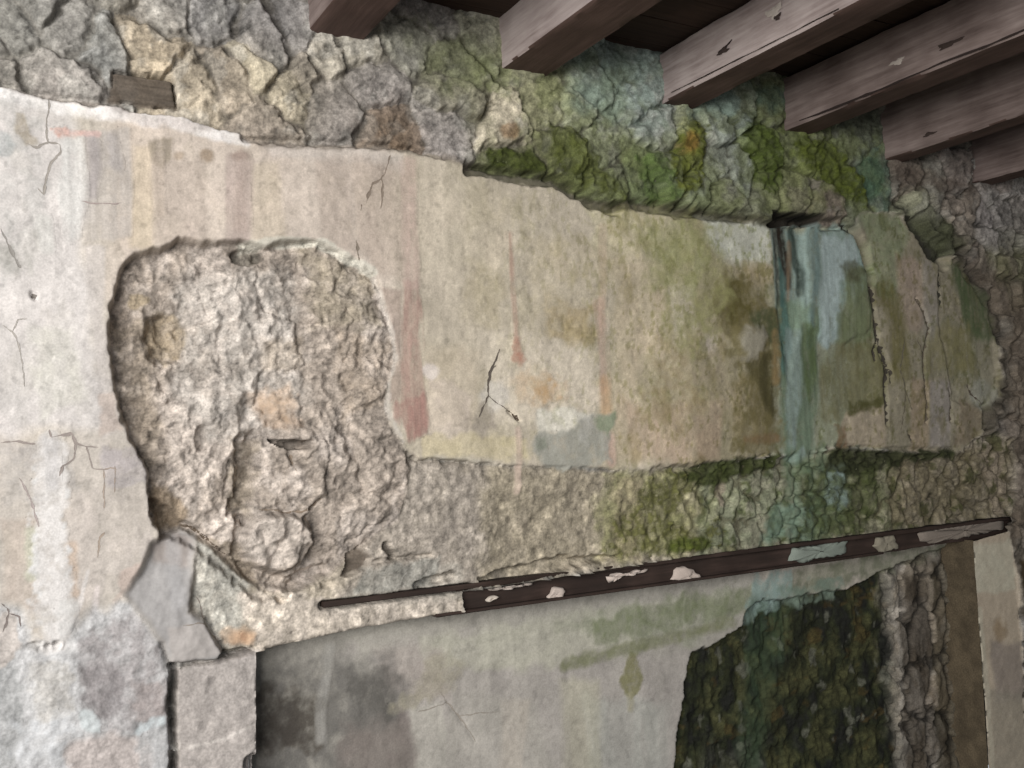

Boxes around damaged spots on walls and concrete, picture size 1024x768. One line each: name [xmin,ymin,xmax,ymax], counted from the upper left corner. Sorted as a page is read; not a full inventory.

crack [26,99,62,195]
crack [360,156,390,211]
crack [3,318,25,386]
crack [479,349,506,417]
water stain [741,220,863,547]
crack [868,216,981,429]
crack [1,430,117,507]
spalling [108,240,785,651]
spalling [856,429,1020,534]
spalling [674,626,746,768]
spalling [764,549,960,768]